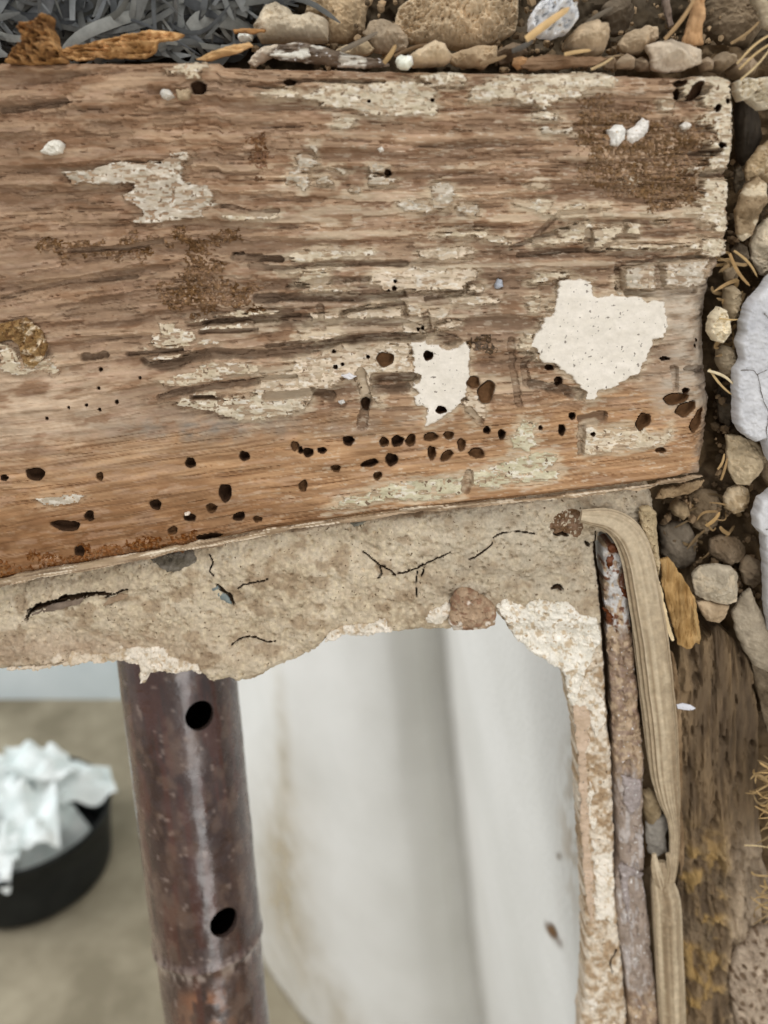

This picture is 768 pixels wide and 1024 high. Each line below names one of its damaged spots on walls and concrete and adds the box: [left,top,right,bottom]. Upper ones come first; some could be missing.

peeling [61,152,279,223]
peeling [518,76,733,400]
peeling [143,231,512,426]
crack [25,589,128,619]
crack [209,555,268,605]
crack [231,635,276,645]
crack [363,530,612,745]
corrosion [606,544,618,569]